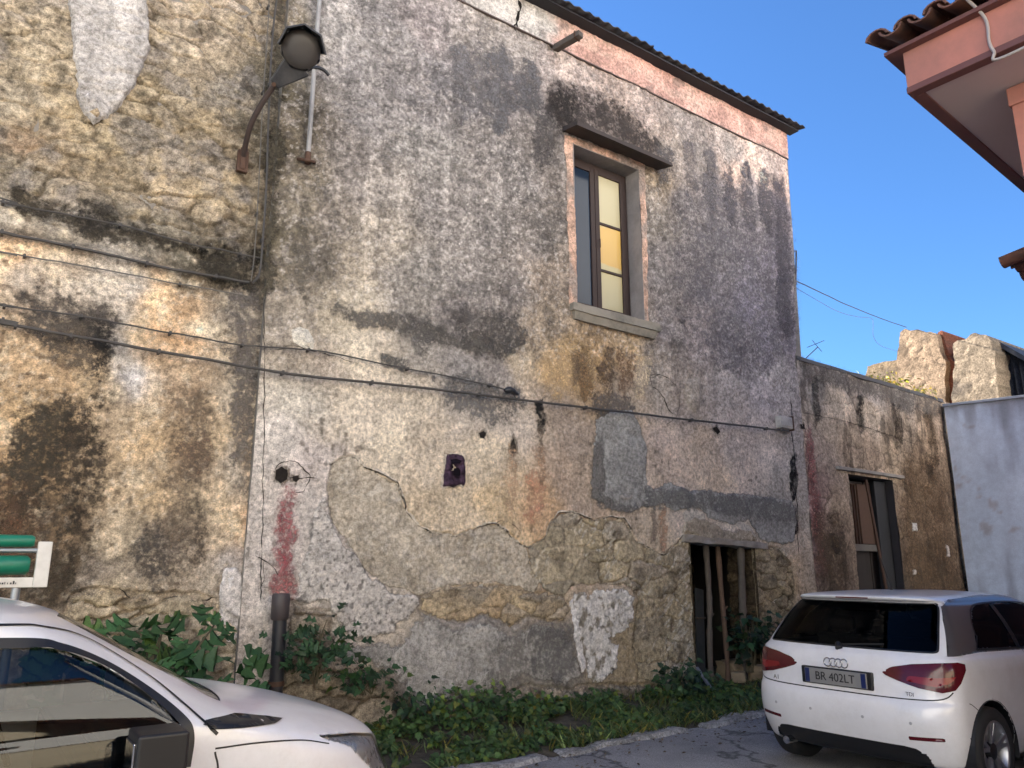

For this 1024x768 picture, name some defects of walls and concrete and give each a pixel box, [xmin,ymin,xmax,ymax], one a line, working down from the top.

crack [514,0,522,31]
water stain [10,0,287,592]
water stain [331,302,529,359]
water stain [449,42,799,374]
water stain [0,389,114,608]
corrosion [270,486,299,600]
spalling [283,604,414,728]
spalling [327,455,795,722]
water stain [799,356,968,591]